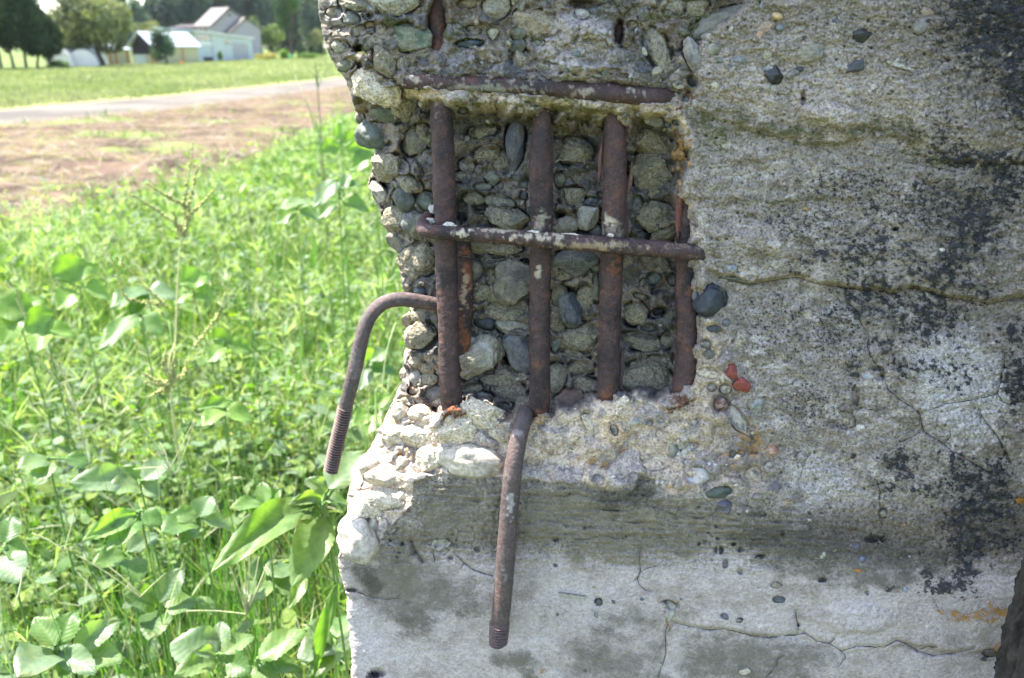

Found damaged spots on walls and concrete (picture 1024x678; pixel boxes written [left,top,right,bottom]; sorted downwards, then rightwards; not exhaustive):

rust [671,130,692,240]
spalling [318,0,779,508]
spalling [336,242,530,564]
rust [437,405,466,426]
rust [665,391,700,414]
crack [757,272,1023,471]
crack [658,617,975,678]